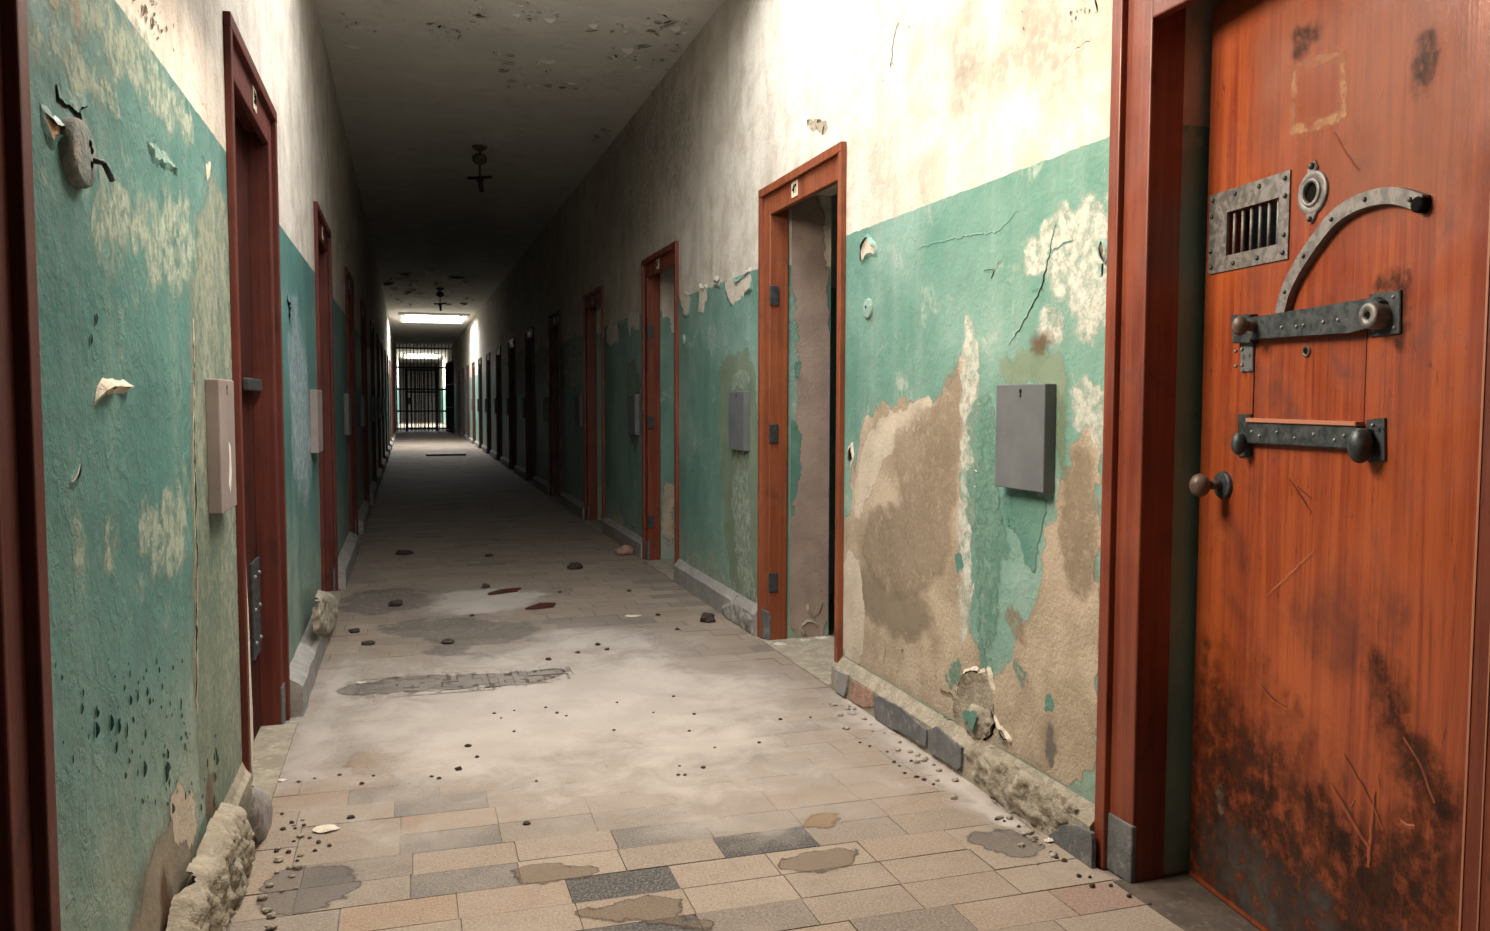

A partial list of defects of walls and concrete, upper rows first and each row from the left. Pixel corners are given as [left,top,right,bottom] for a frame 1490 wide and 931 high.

peeling [40,104,65,150]
peeling [30,0,193,143]
peeling [146,140,178,176]
peeling [91,170,205,293]
peeling [662,266,753,332]
crack [916,210,1017,278]
crack [1008,223,1103,344]
peeling [1096,237,1107,266]
flaking render [663,482,674,546]
peeling [684,451,757,636]
flaking render [774,196,1102,787]
flaking render [81,658,256,931]